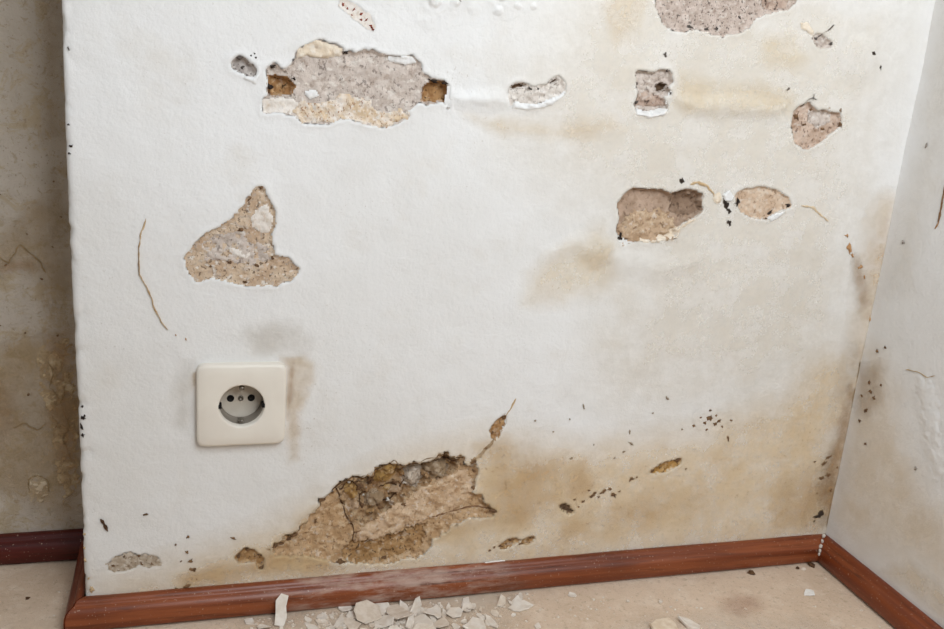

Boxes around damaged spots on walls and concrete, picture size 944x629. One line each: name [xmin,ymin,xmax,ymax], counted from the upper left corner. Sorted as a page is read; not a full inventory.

spalling [655,0,796,37]
spalling [231,40,450,128]
spalling [508,76,566,111]
spalling [634,69,673,119]
spalling [791,94,842,150]
spalling [184,186,299,286]
spalling [616,177,829,246]
spalling [234,399,516,570]
damp [433,393,838,558]
spalling [105,551,162,572]
damp [175,535,225,589]